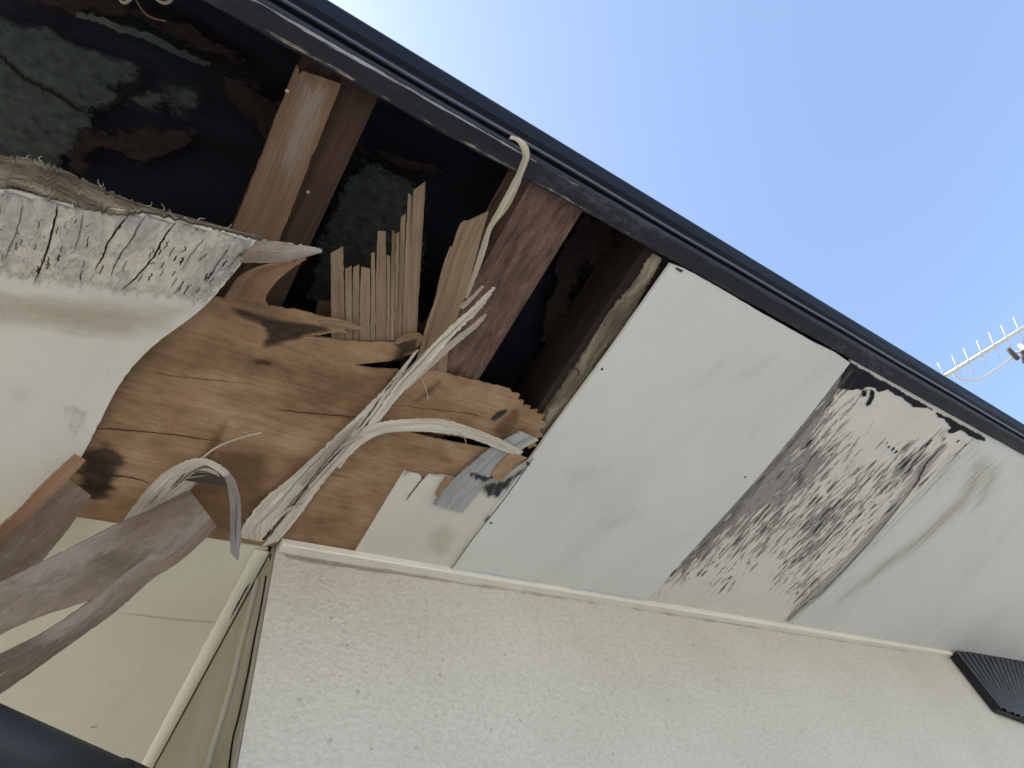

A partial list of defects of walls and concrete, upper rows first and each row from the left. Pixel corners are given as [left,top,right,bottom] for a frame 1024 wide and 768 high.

crack [0,190,251,301]
leakage [78,444,123,499]
peeling [435,477,453,497]
peeling [657,372,980,622]